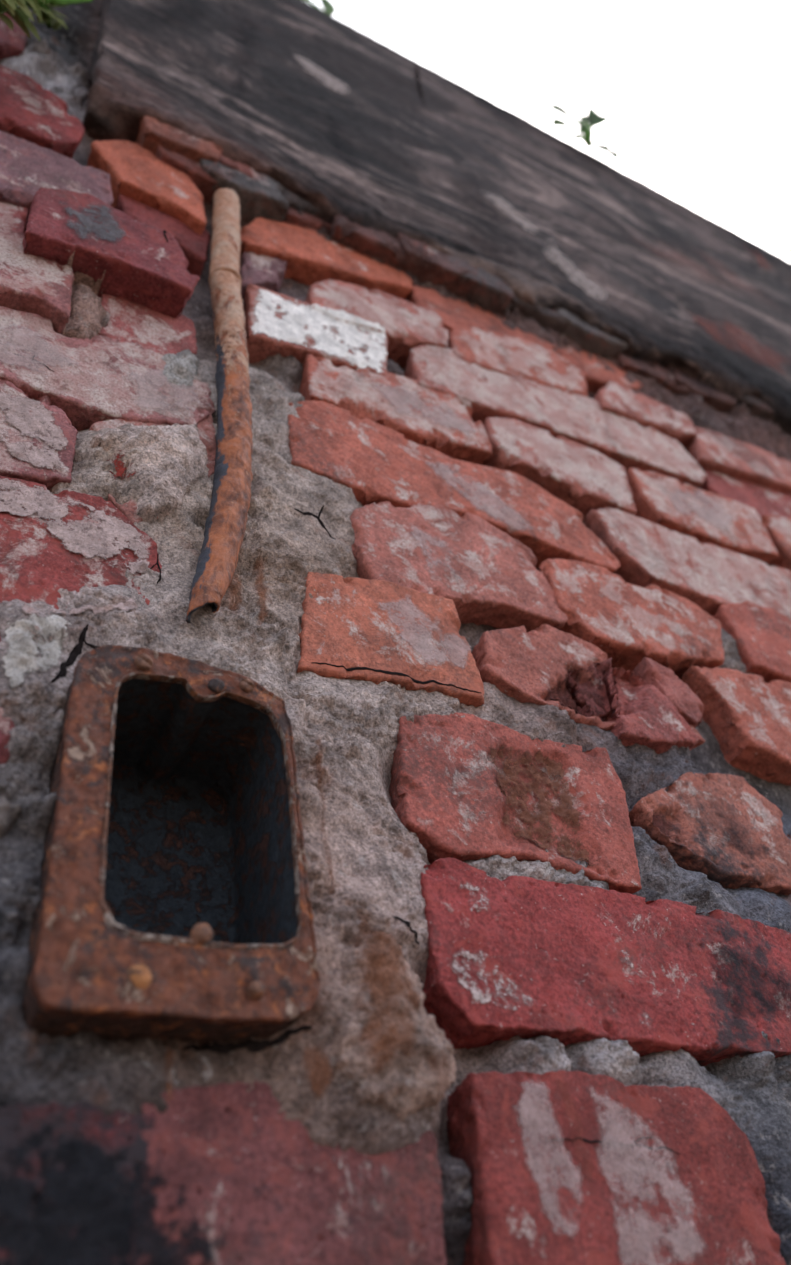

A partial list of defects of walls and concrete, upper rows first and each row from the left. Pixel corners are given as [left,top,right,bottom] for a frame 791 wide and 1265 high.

peeling [59,201,126,241]
peeling [251,289,388,374]
spalling [107,450,136,483]
peeling [0,478,150,574]
crack [294,505,335,539]
crack [51,624,100,683]
crack [311,662,481,693]
spalling [545,657,704,754]
leakage [0,1125,226,1265]